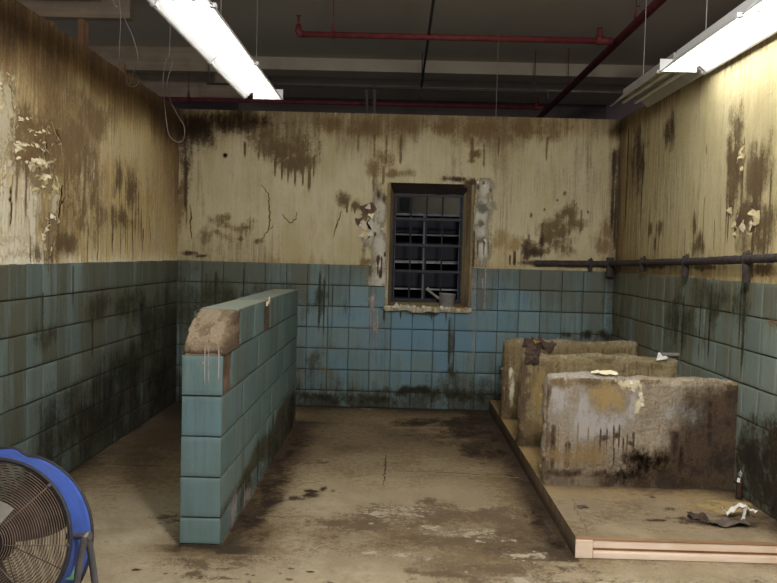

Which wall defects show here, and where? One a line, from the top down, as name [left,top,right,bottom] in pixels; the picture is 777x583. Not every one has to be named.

flaking render [0,68,60,255]
water stain [243,124,321,190]
crack [258,185,297,244]
flaking render [355,180,387,286]
flaking render [473,178,496,267]
water stain [509,192,589,266]
flaking render [726,201,760,238]
water stain [725,103,777,370]
spalling [184,309,241,393]
water stain [231,313,487,527]
spalling [615,379,645,414]
water stain [530,368,777,521]